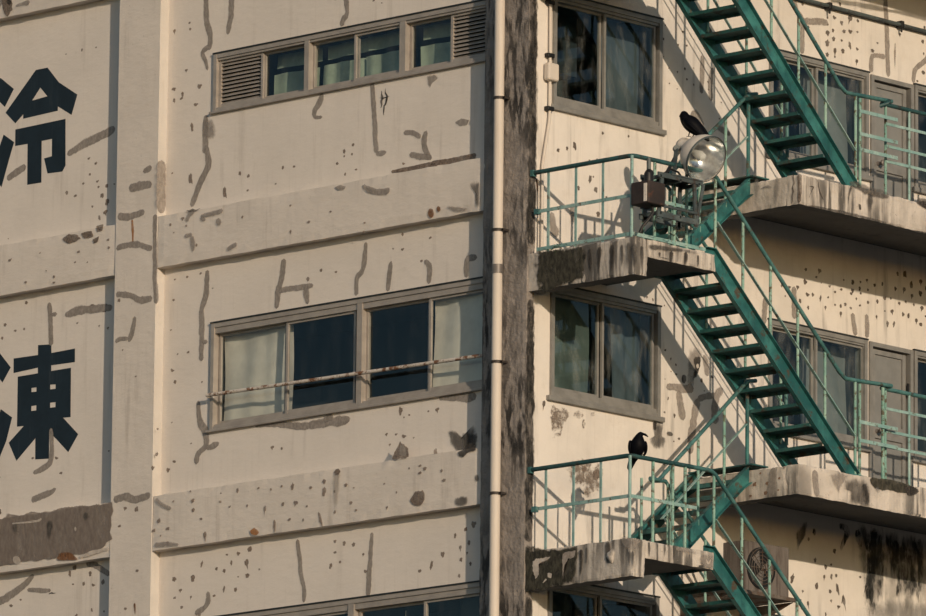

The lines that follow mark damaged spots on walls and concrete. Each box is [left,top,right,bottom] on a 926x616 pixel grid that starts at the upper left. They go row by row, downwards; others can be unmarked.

leakage [528,0,538,243]
leakage [808,182,888,223]
leakage [535,243,699,293]
leakage [525,300,587,616]
peeling [571,464,603,496]
leakage [652,422,673,447]
peeling [0,502,121,587]
leakage [621,538,650,563]
leakage [840,523,926,608]